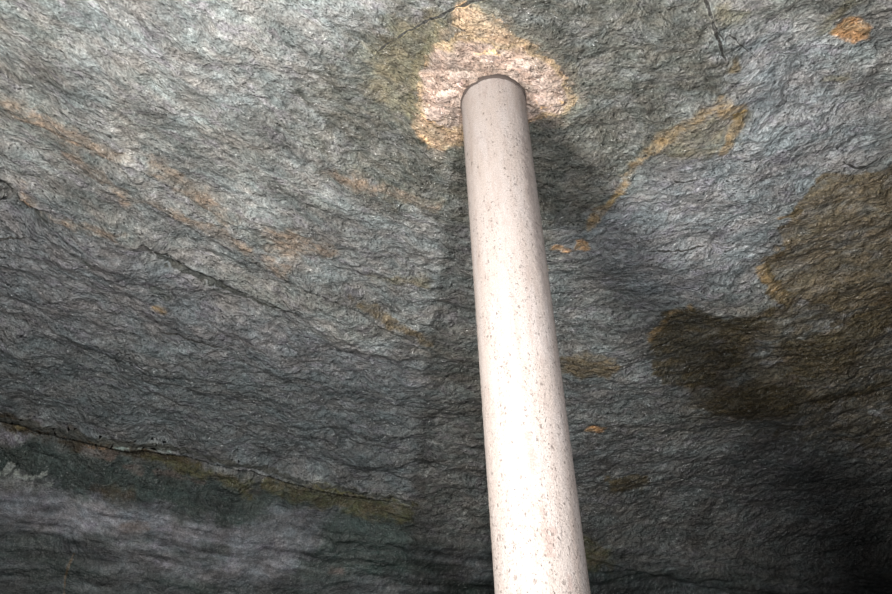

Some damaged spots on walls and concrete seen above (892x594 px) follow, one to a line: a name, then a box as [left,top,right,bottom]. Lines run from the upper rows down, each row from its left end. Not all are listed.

spalling [407,0,580,151]
crack [703,0,758,64]
corrosion [806,0,877,47]
corrosion [545,93,759,255]